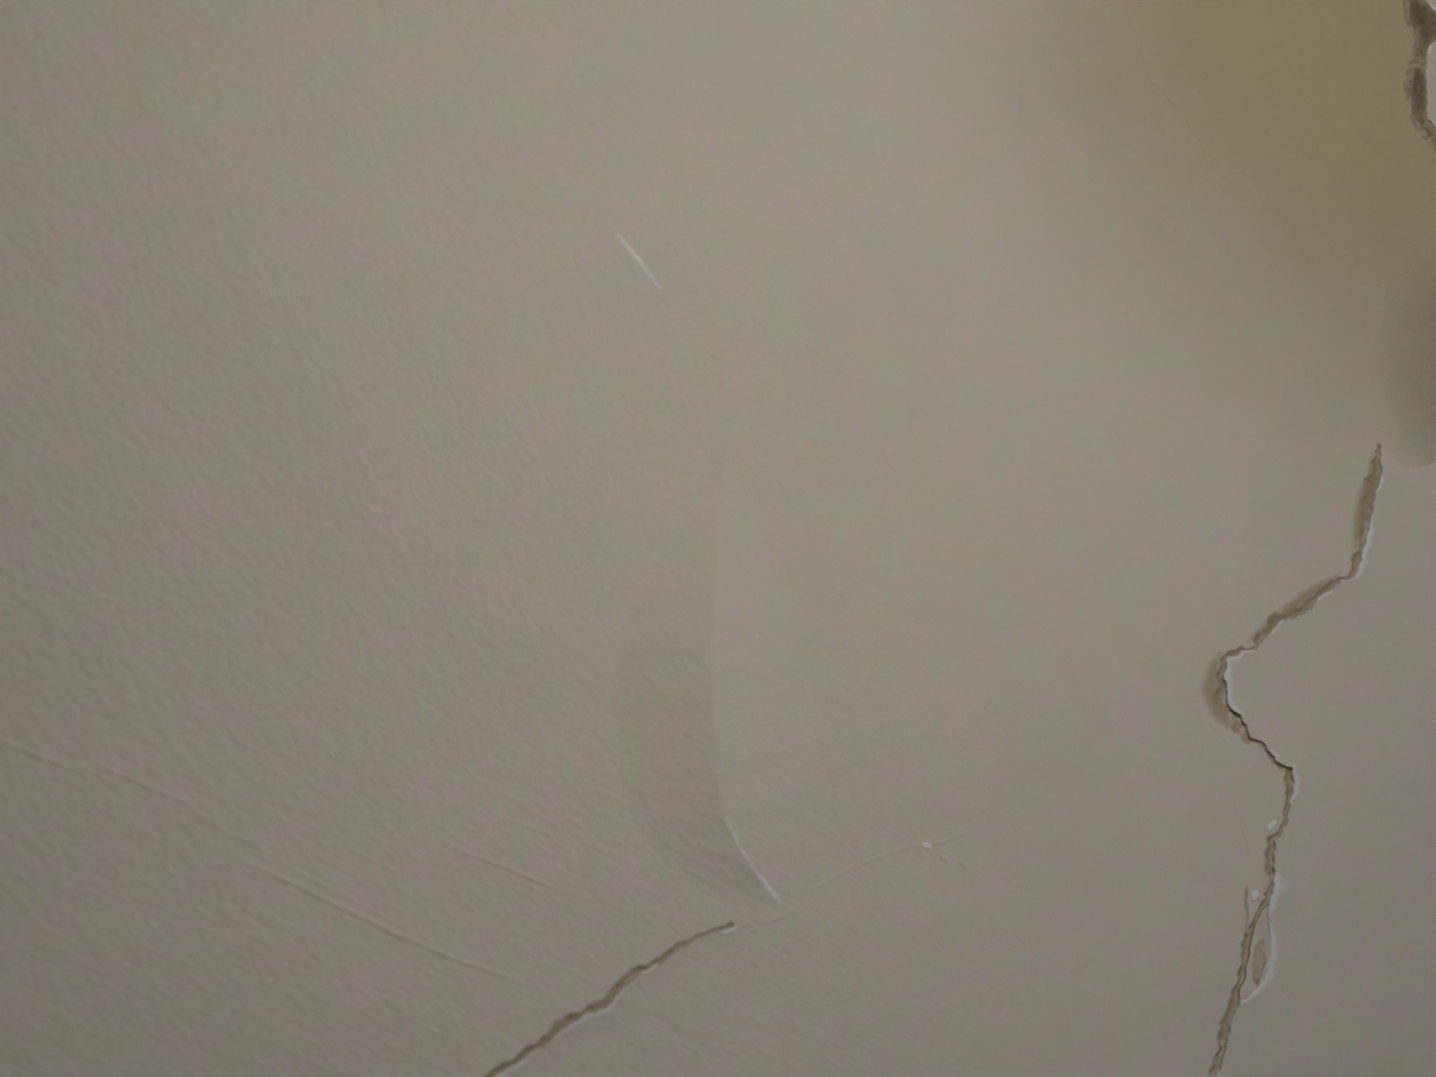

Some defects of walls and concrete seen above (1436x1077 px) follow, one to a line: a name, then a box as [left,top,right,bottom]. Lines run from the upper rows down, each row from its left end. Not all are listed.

peeling [1412,0,1436,130]
crack [1207,443,1385,1077]
crack [482,914,768,1077]